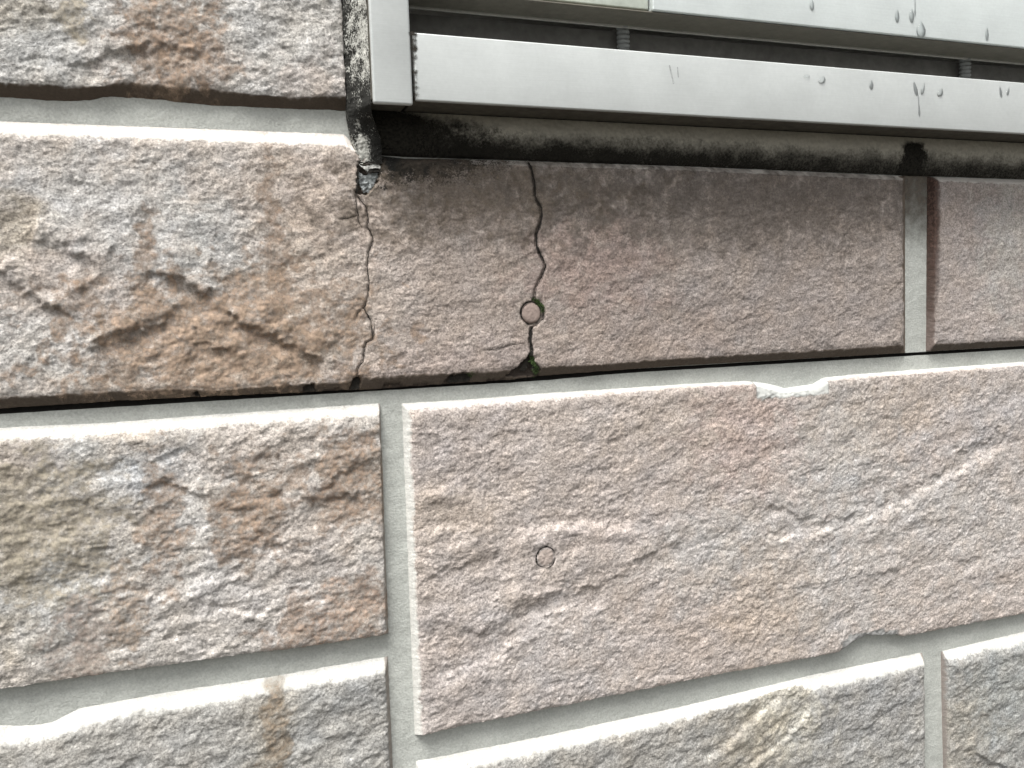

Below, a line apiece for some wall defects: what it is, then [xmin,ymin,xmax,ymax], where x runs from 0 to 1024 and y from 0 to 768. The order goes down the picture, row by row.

water stain [342,0,1024,242]
crack [339,192,375,381]
crack [491,161,546,356]